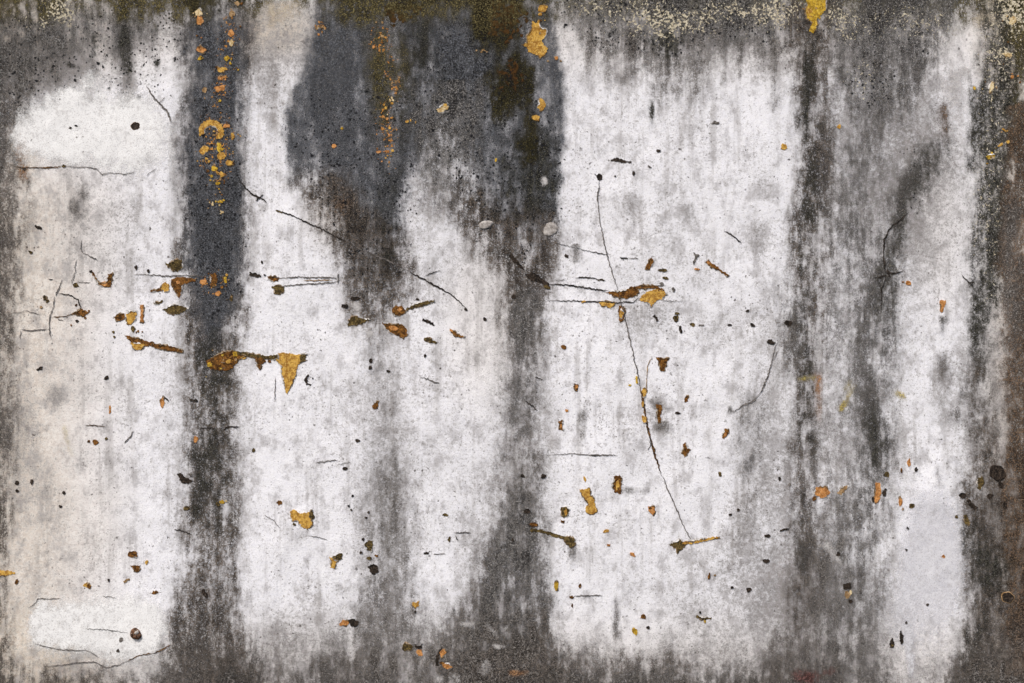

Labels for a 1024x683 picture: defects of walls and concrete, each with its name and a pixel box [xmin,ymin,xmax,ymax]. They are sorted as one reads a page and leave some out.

damp [1008,0,1024,78]
damp [0,0,283,683]
peeling [112,258,233,354]
peeling [205,349,313,393]
damp [279,0,956,683]
peeling [599,258,675,323]
crack [595,174,691,539]
crack [733,342,778,412]
crack [874,212,909,312]
damp [945,102,1024,683]
peeling [277,500,315,529]
peeling [579,477,598,515]